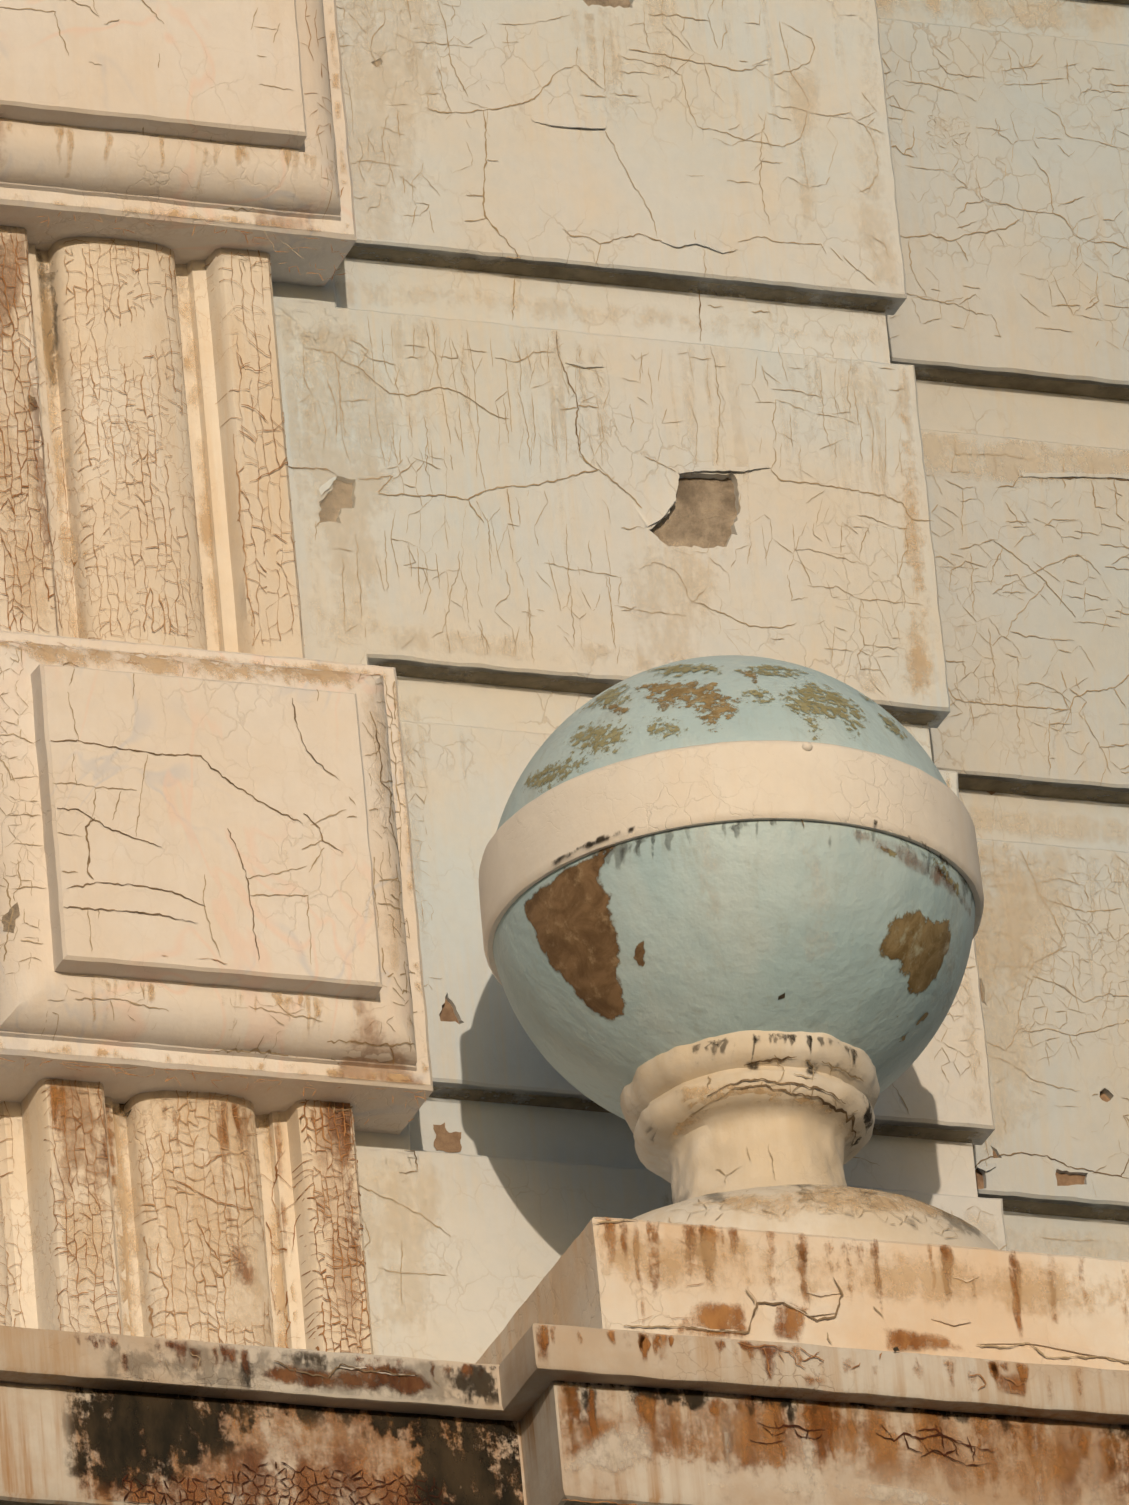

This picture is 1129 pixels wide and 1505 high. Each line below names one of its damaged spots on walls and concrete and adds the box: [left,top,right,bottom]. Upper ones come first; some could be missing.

spalling [583,0,631,8]
spalling [315,475,353,523]
spalling [633,462,772,548]
crack [0,212,449,1384]
spalling [439,996,460,1024]
crack [593,1055,1006,1378]
rust [687,1226,718,1279]
water stain [166,1342,186,1354]
rust [659,1304,804,1377]
rust [888,1329,949,1350]
crack [970,1342,1129,1393]
water stain [69,1346,524,1505]